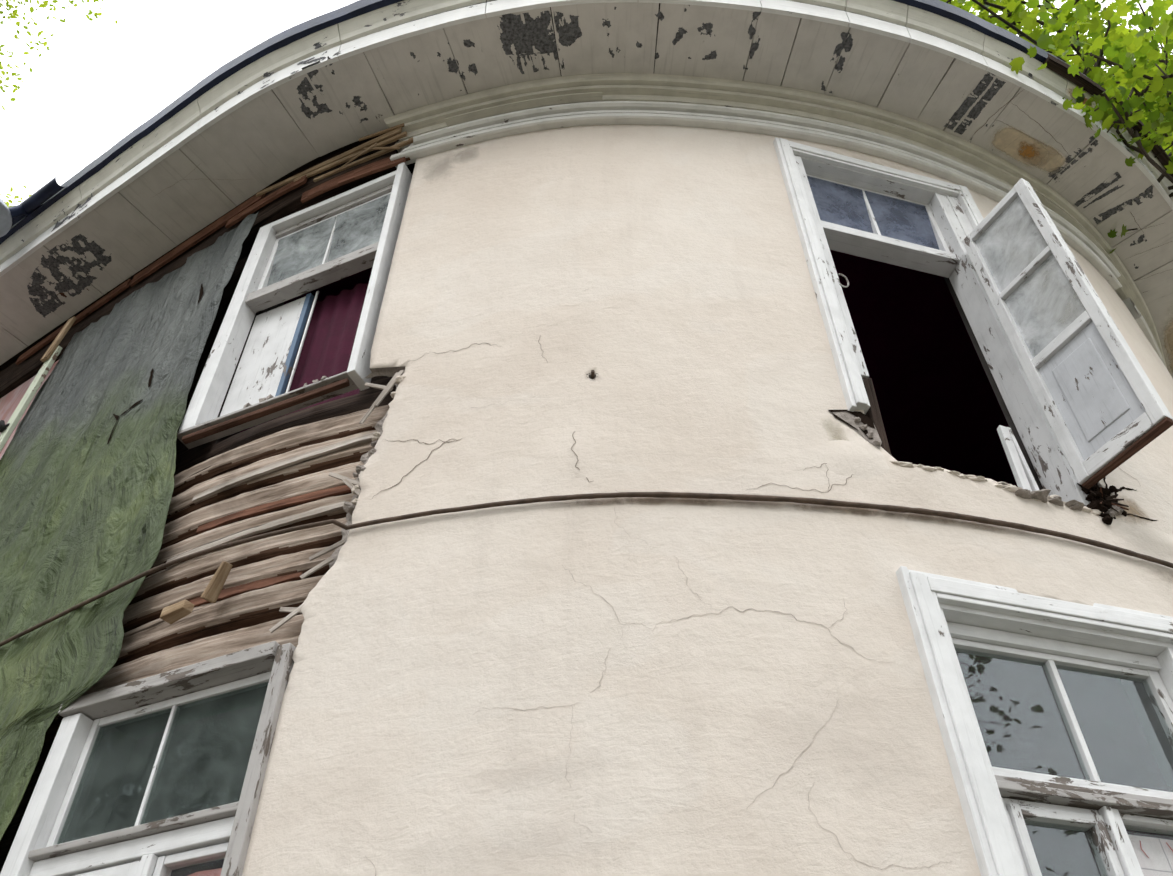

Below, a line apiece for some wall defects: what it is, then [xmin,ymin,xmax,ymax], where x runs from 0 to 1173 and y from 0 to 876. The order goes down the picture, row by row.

peeling [497,11,582,74]
peeling [944,72,1006,140]
leakage [993,128,1064,172]
peeling [27,234,112,318]
flaking render [828,410,882,449]
flaking render [300,370,406,579]
crack [373,439,461,497]
crack [747,463,853,492]
flaking render [889,461,1129,525]
flaking render [269,604,302,633]
crack [474,556,893,786]
crack [747,699,950,870]